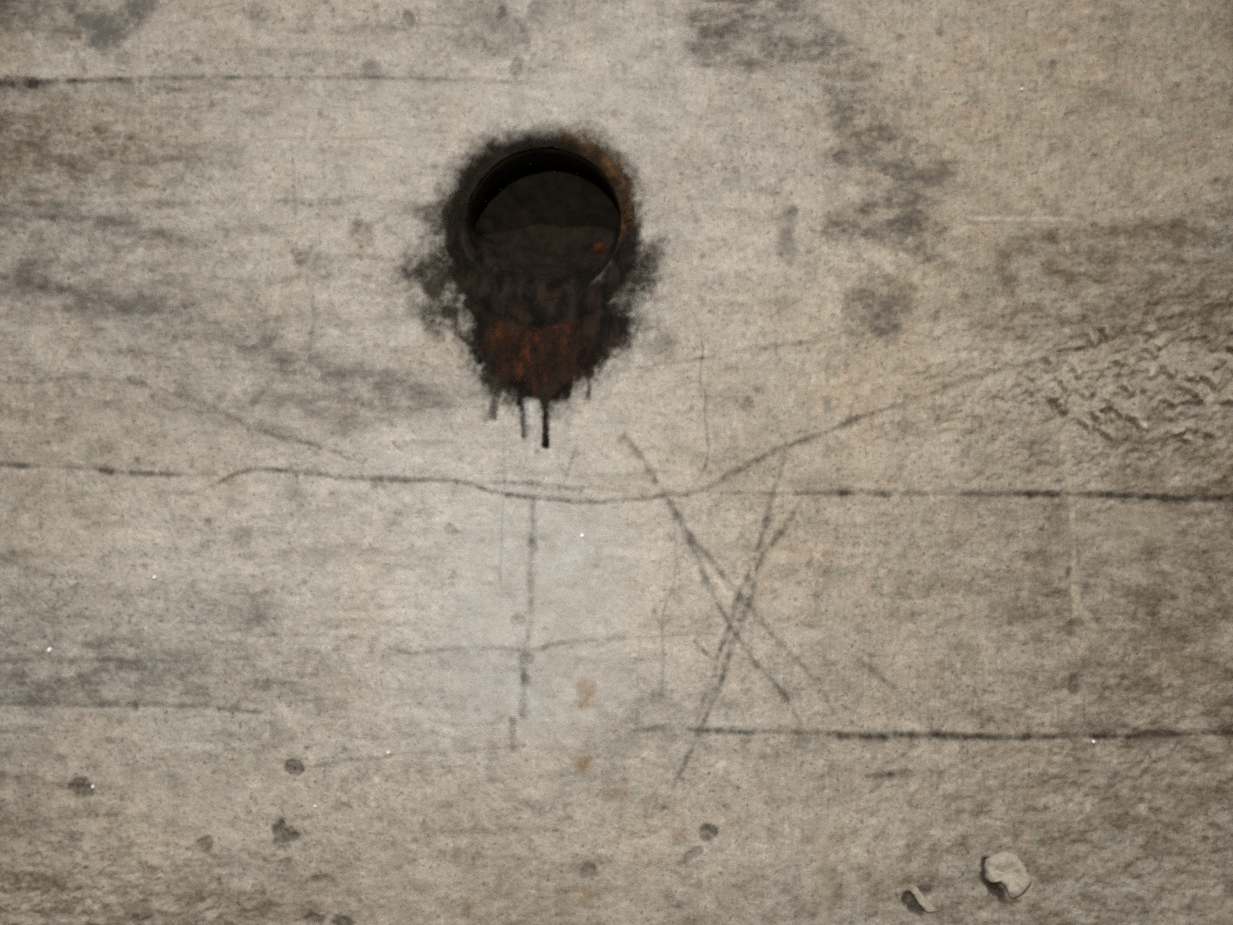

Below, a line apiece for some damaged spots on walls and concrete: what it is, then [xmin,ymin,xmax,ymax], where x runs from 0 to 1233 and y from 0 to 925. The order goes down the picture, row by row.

leakage [860,165,952,261]
corrosion [410,134,658,453]
crack [1017,491,1233,500]
crack [838,732,1204,740]